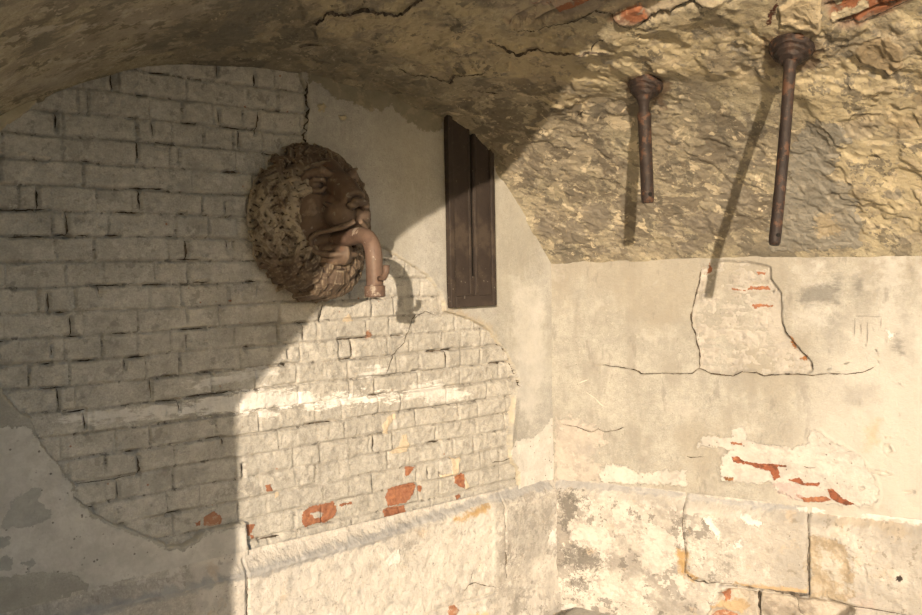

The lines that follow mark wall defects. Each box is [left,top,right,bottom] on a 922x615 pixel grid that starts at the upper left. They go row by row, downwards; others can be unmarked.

crack [300,0,441,48]
crack [495,0,717,57]
flaking render [776,0,908,35]
crack [401,68,498,94]
crack [301,82,310,142]
peeling [692,113,875,376]
spalling [0,64,693,588]
crack [607,269,873,376]
peeling [687,422,885,512]
peeling [698,510,768,554]
spalling [701,520,869,615]